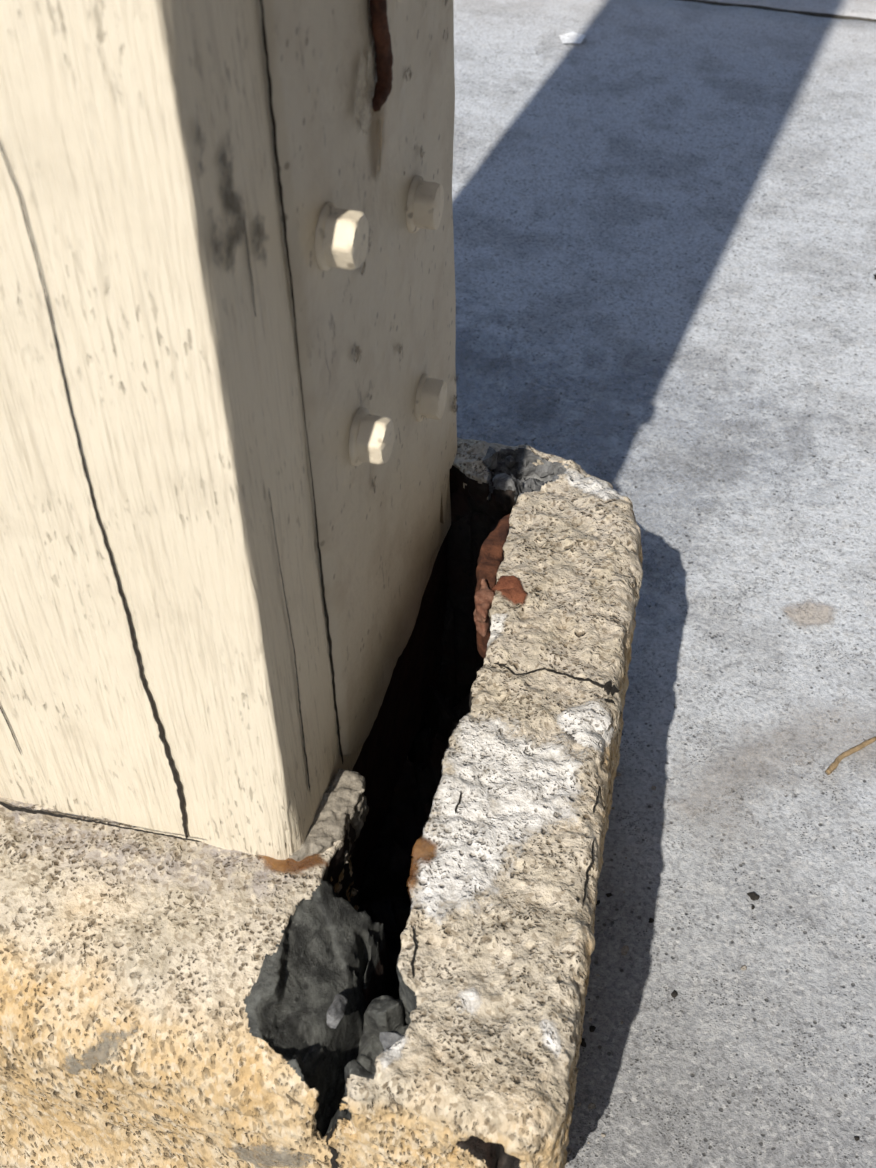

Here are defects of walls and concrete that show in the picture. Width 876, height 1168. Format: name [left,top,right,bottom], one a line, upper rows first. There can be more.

crack [244,219,256,317]
crack [0,146,201,842]
crack [268,488,310,790]
corrosion [473,575,527,637]
crack [493,663,622,718]
spalling [244,868,417,1137]
spalling [456,1136,520,1168]